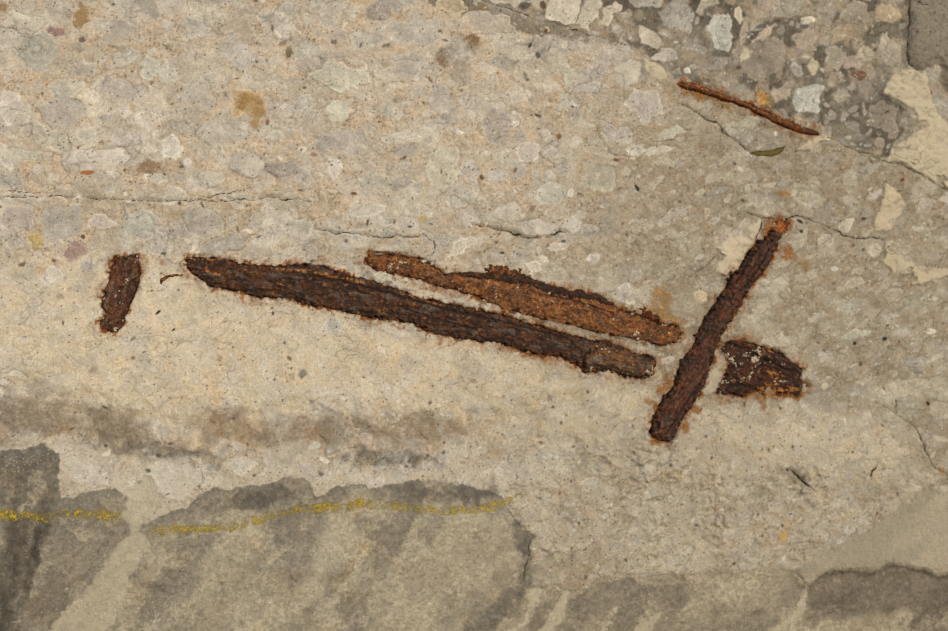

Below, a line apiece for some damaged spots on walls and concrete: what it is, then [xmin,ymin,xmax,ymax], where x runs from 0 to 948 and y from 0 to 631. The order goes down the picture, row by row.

spalling [545,0,590,25]
spalling [624,88,668,126]
rust [677,77,821,139]
crack [683,105,785,156]
spalling [62,147,131,173]
spalling [534,182,567,205]
spalling [120,209,159,240]
spalling [194,233,248,258]
flaking render [716,218,761,276]
rust [95,252,144,336]
spalling [753,278,788,299]
rust [180,215,807,447]